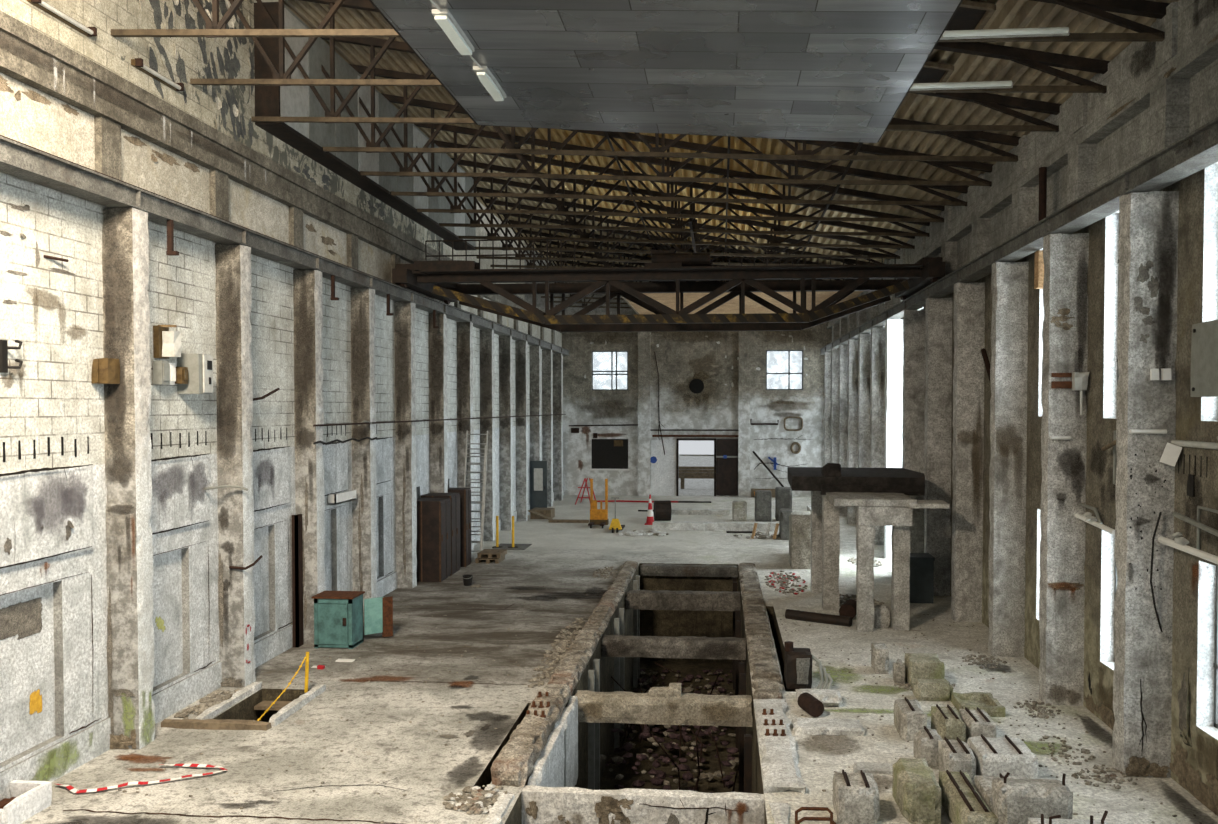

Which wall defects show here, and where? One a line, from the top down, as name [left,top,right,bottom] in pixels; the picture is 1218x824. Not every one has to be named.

damp [154,465,207,499]
damp [32,480,85,525]
rust [1049,582,1080,595]
peeling [17,627,42,640]
crack [644,800,748,824]